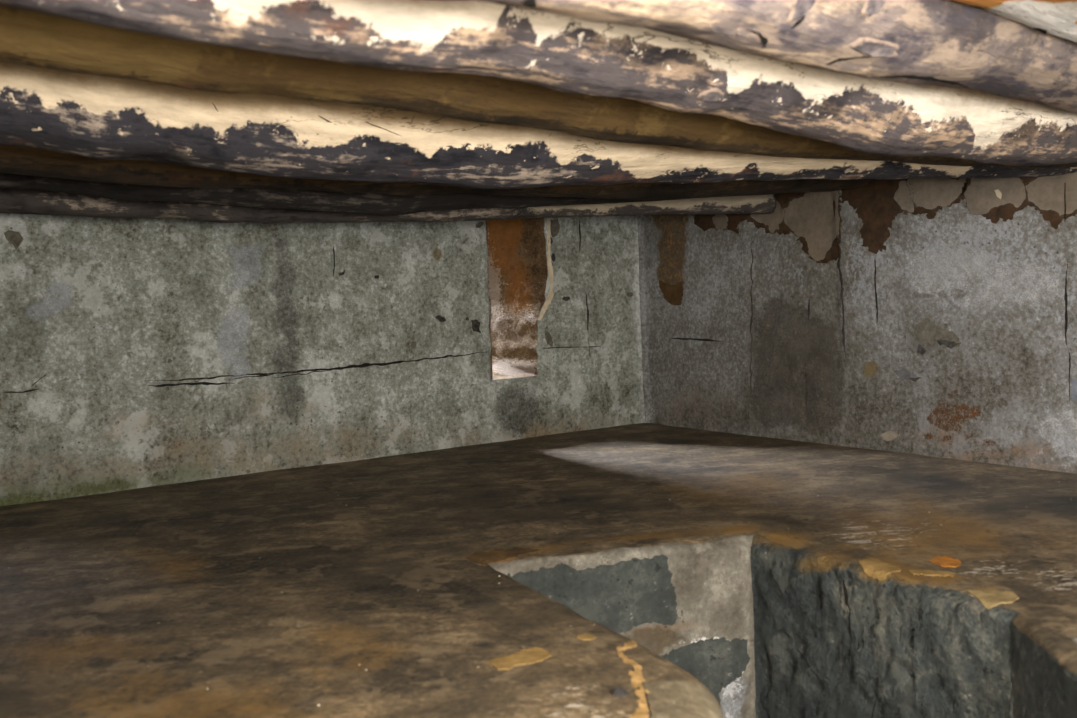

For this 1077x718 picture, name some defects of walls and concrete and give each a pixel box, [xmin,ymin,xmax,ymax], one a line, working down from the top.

peeling [694,172,1077,263]
crack [150,351,488,387]
corrosion [924,390,981,442]
spalling [439,524,1077,718]
crack [616,639,652,718]